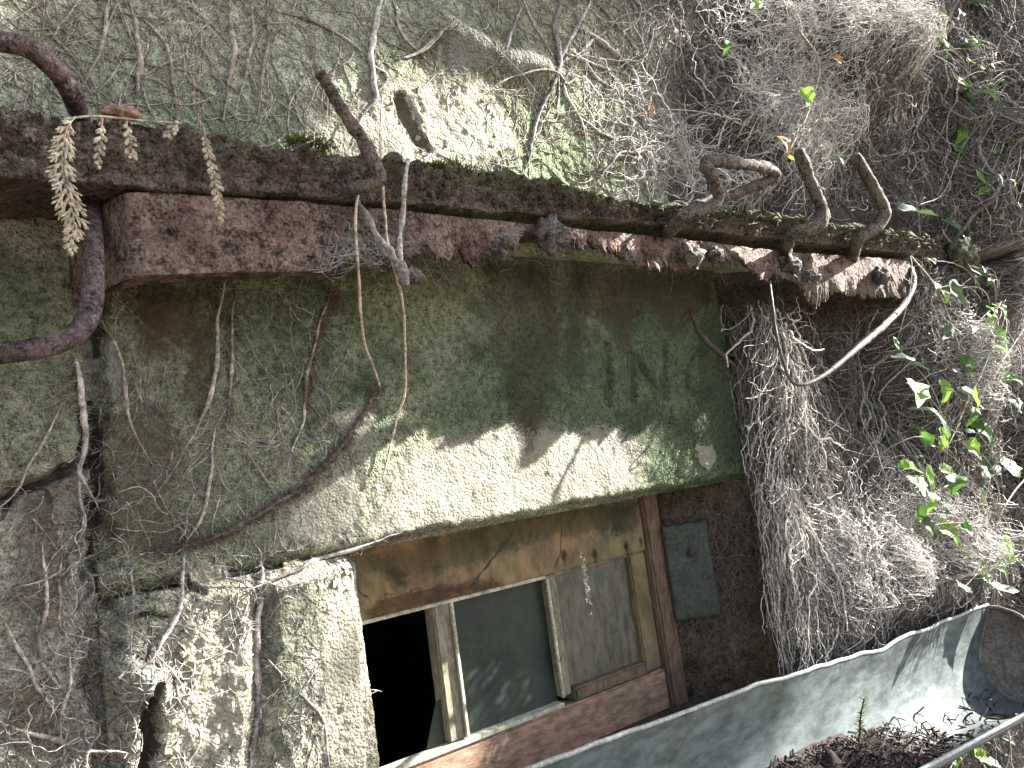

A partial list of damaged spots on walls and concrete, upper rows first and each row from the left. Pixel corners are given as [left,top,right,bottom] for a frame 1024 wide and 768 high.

rust [676,242,724,269]
peeling [695,443,717,470]